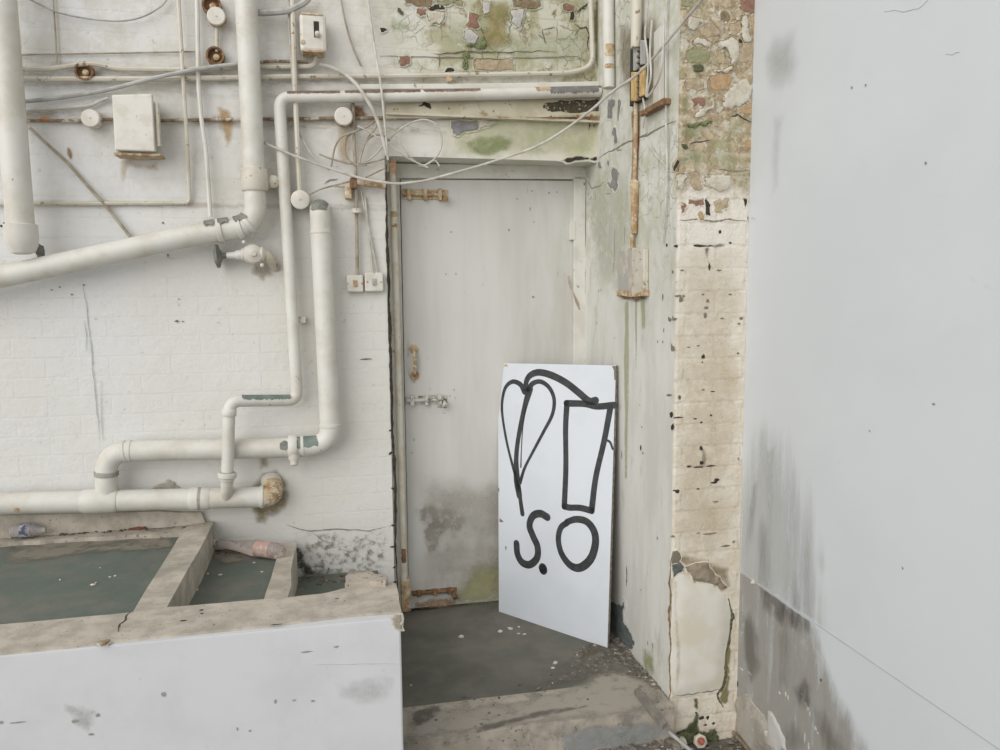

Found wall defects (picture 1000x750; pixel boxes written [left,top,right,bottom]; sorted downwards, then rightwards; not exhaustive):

spalling [403,0,488,30]
spalling [397,55,412,68]
spalling [682,0,755,109]
corrosion [221,111,231,137]
corrosion [632,111,640,179]
spalling [671,157,730,223]
crack [291,165,398,588]
corrosion [255,478,286,521]
water stain [297,537,382,576]
peeling [670,549,729,591]
water stain [765,592,809,625]
water stain [746,623,754,666]